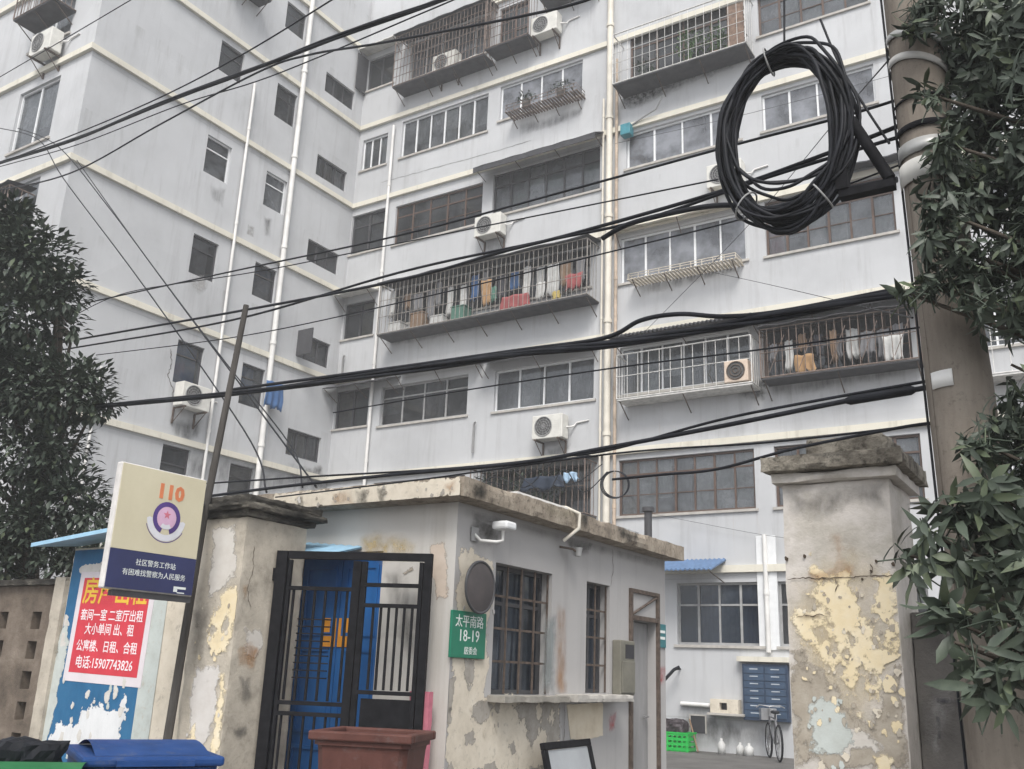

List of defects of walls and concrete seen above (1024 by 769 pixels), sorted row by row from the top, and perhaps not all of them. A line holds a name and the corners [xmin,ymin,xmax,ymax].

peeling [42,625,126,741]
peeling [195,586,237,661]
peeling [206,673,226,754]
flaking render [430,542,562,769]
crack [788,564,892,591]
peeling [790,553,909,769]